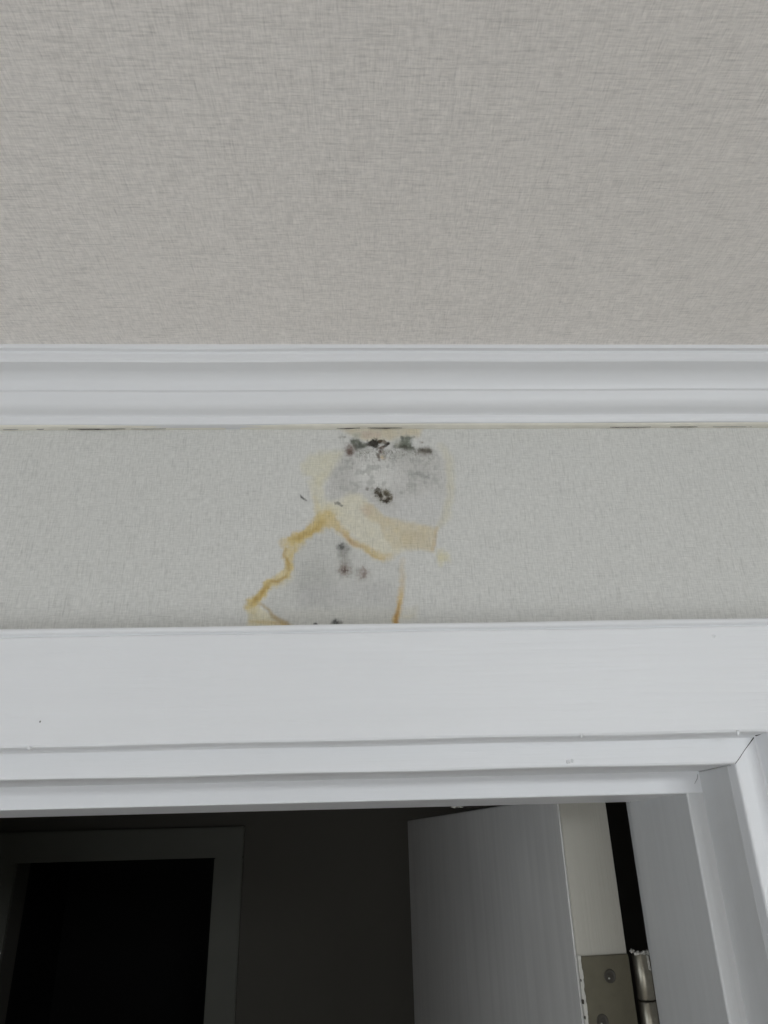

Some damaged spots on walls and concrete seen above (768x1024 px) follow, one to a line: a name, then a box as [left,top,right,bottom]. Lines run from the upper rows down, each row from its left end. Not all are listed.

water stain [242,429,459,626]